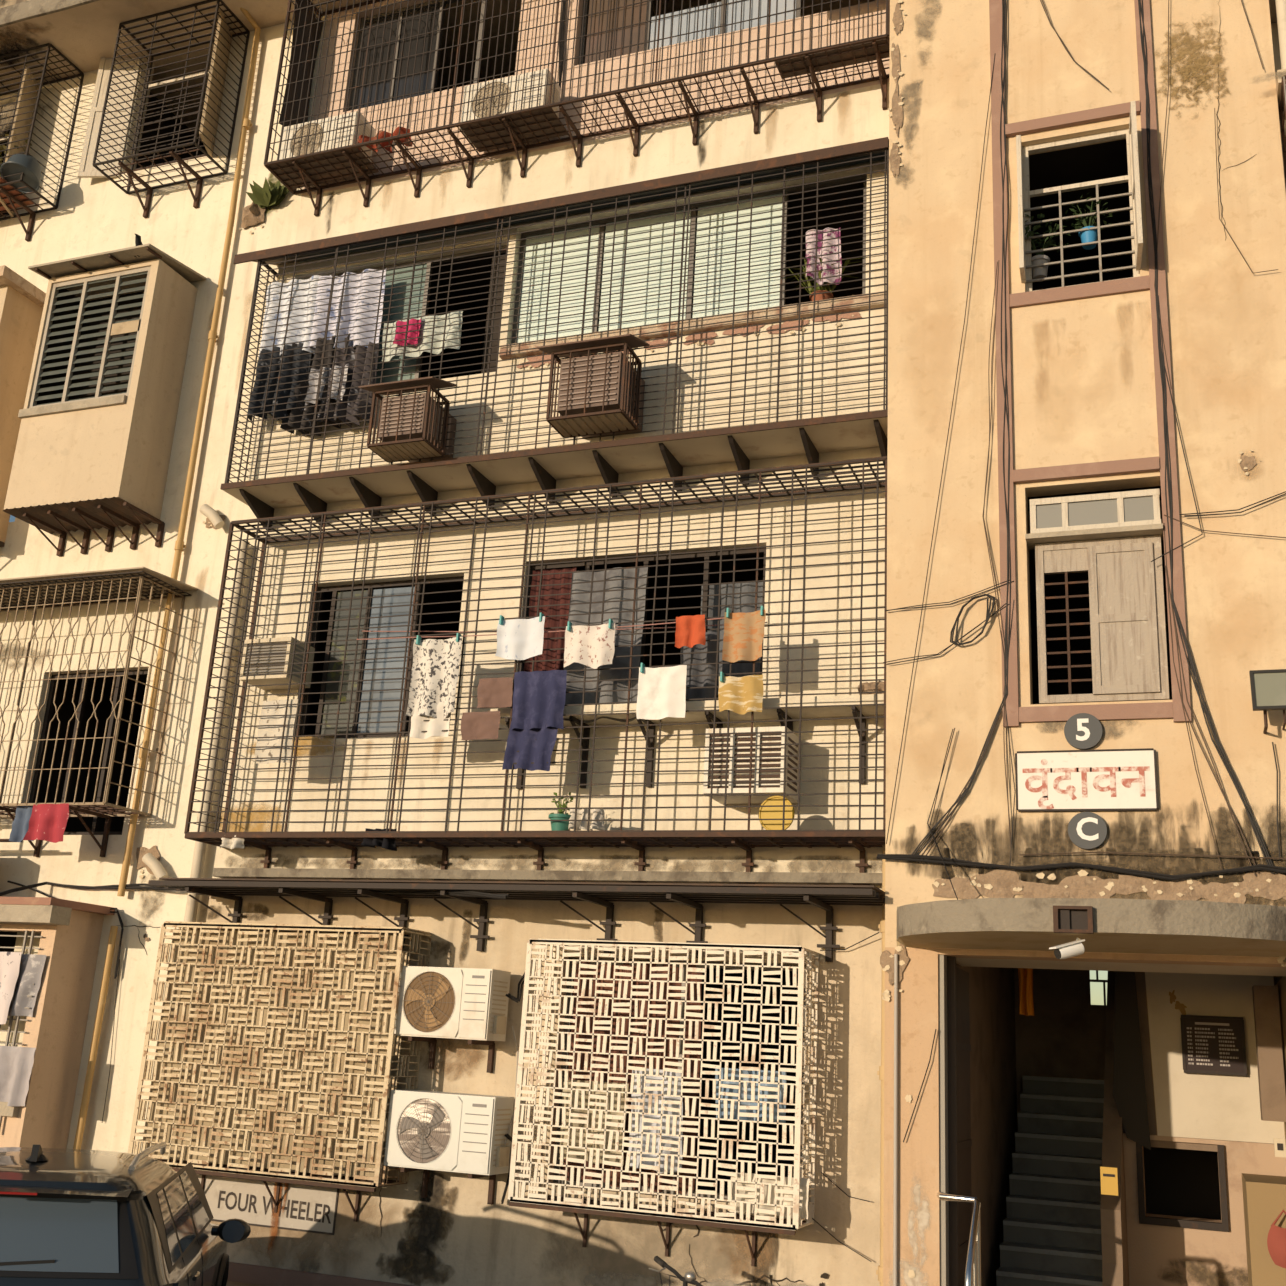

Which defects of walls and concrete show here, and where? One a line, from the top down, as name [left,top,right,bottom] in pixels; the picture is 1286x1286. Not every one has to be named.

water stain [917,0,939,62]
water stain [1158,23,1229,109]
water stain [902,82,920,143]
water stain [897,166,909,182]
water stain [906,804,1286,884]
rust [268,1182,289,1252]
water stain [243,1189,387,1272]
water stain [377,1170,457,1286]
water stain [548,1219,779,1286]